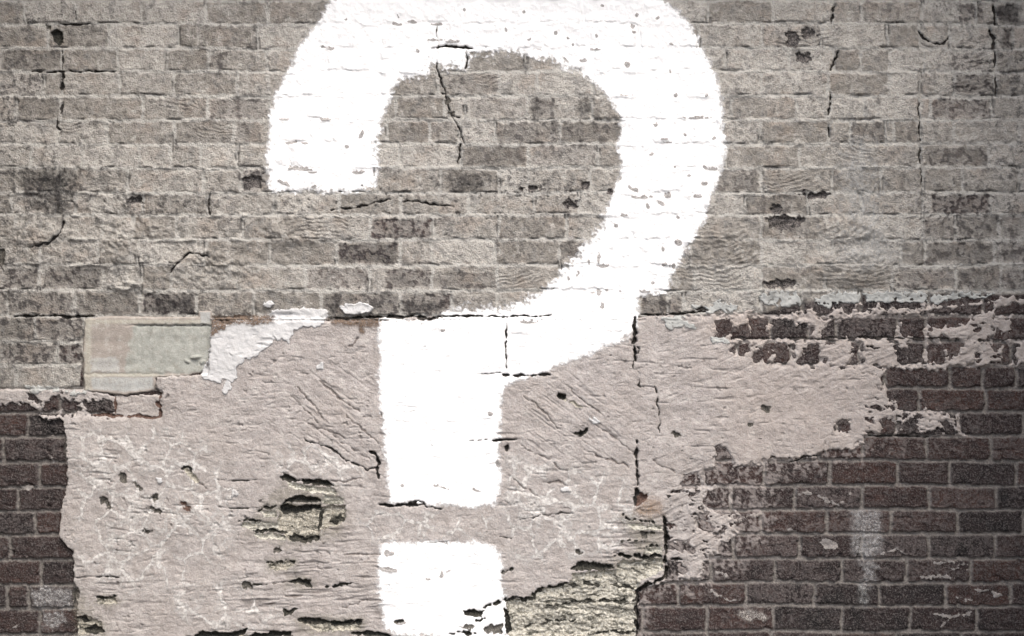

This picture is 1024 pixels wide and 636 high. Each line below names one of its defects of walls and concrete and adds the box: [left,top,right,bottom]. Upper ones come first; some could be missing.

crack [32,51,114,130]
crack [431,29,473,163]
crack [827,52,838,137]
crack [988,6,997,94]
crack [32,221,65,247]
crack [171,252,210,272]
peeling [661,299,738,330]
peeling [759,278,802,308]
peeling [814,290,995,309]
crack [272,307,709,634]
spalling [238,473,346,588]
spalling [449,513,664,636]